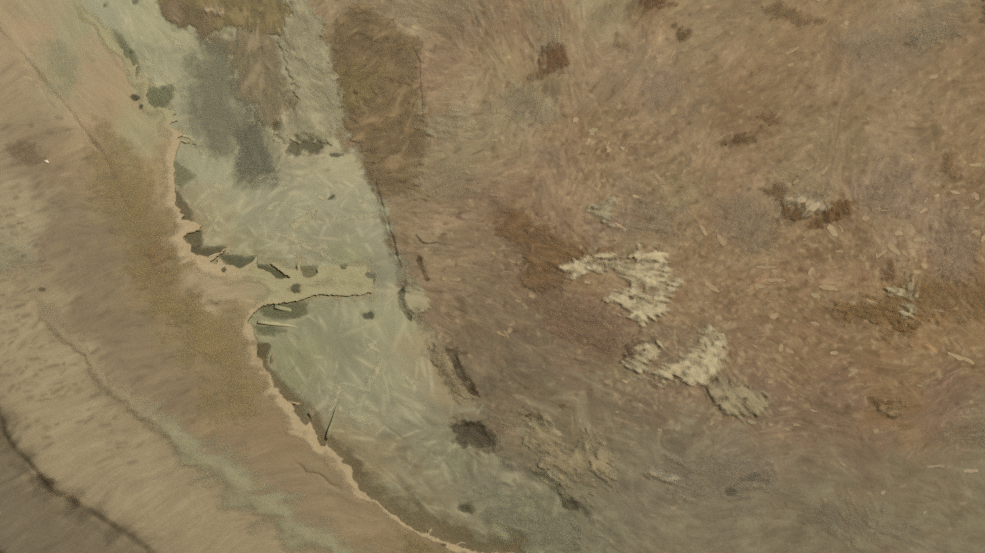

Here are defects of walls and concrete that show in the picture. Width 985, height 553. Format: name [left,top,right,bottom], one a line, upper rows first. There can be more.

peeling [0,0,579,553]